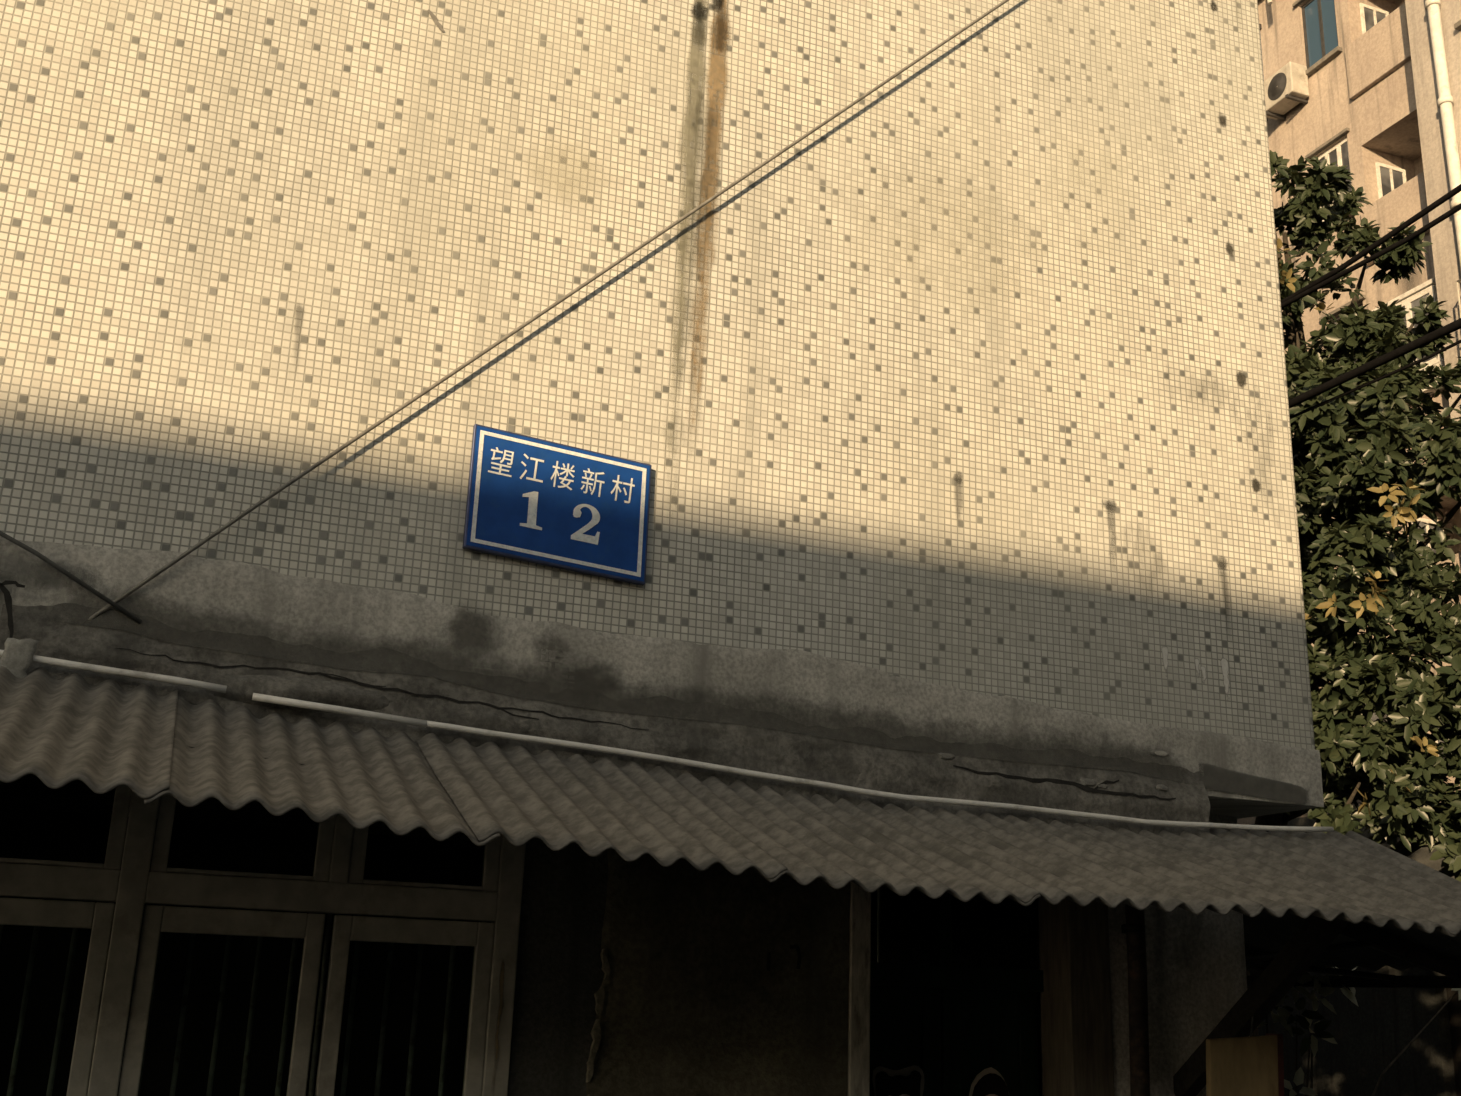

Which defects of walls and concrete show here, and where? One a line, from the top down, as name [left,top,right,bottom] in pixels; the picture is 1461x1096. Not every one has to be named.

rust [673,0,729,389]
leakage [1105,501,1116,545]
leakage [1218,557,1227,601]
crack [116,648,649,730]
leakage [70,594,1307,804]
crack [953,765,1176,800]